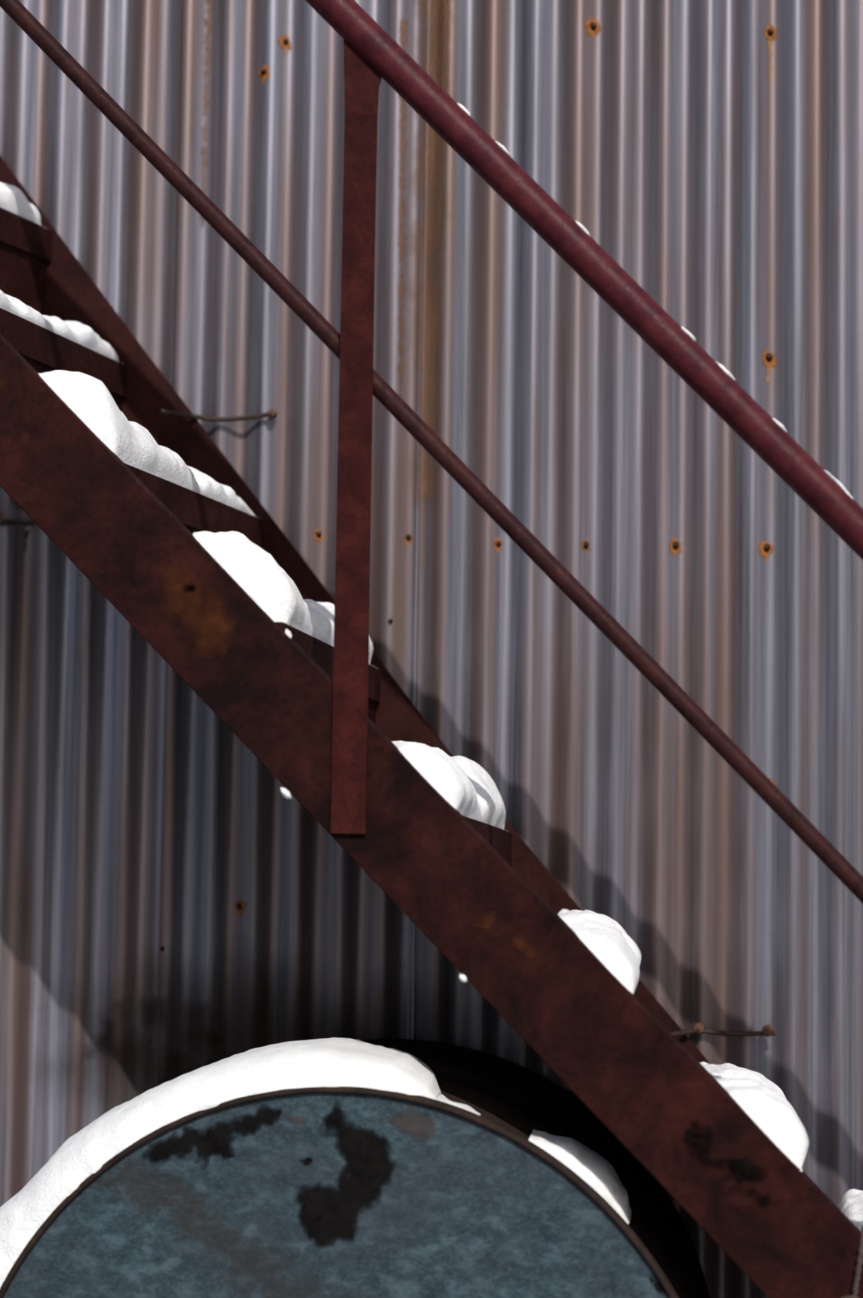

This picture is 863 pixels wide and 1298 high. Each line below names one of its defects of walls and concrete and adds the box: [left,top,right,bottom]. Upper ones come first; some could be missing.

rust [419,0,448,90]
rust [585,18,601,37]
rust [764,25,777,78]
rust [398,96,445,430]
rust [762,350,777,382]
rust [759,541,774,561]